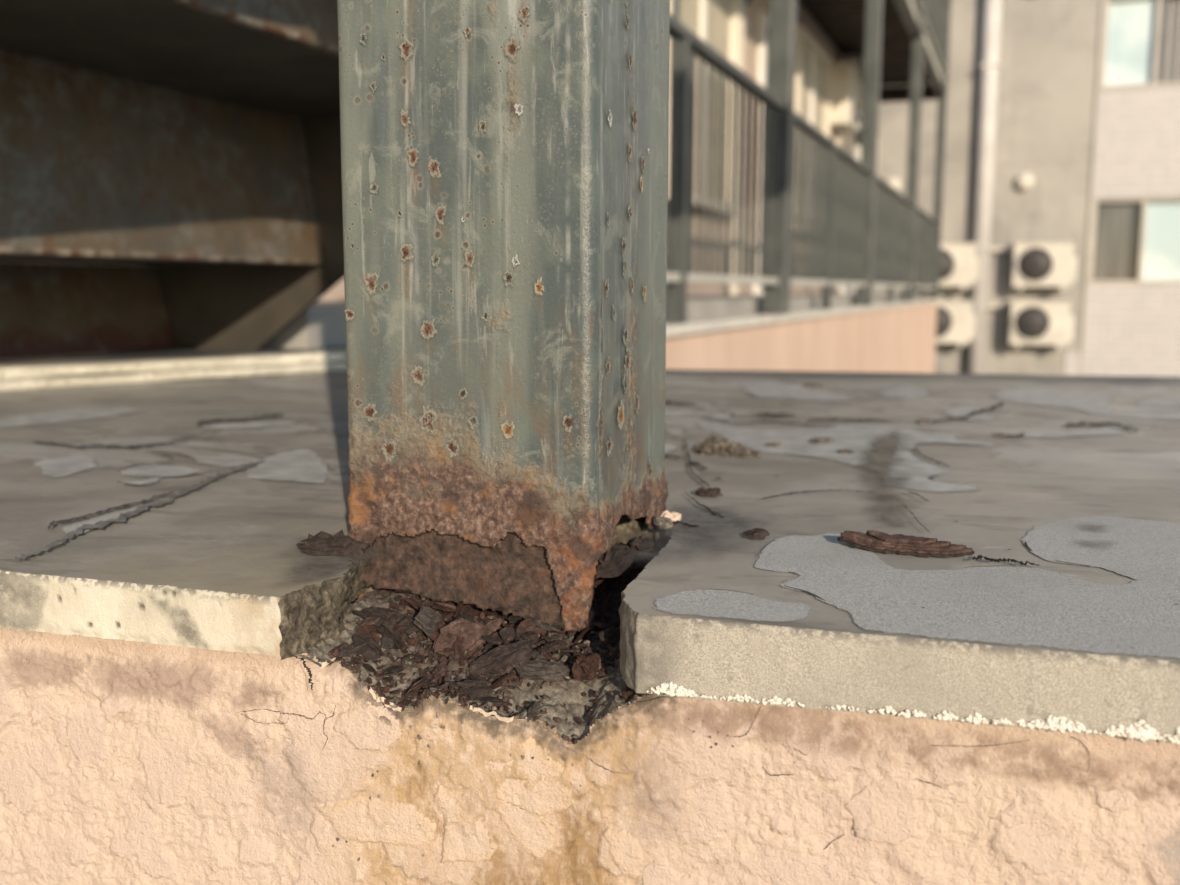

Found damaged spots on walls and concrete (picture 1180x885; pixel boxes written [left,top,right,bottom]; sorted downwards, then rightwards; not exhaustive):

rust [518,5,530,24]
rust [504,34,520,63]
rust [406,147,442,179]
rust [502,254,520,288]
rust [534,276,545,296]
rust [596,510,682,579]
peeling [654,516,1180,659]
rust [413,606,487,658]
spalling [297,570,668,745]
crack [238,656,336,749]
efflorescence [646,681,805,708]
efflorescence [819,705,1180,745]